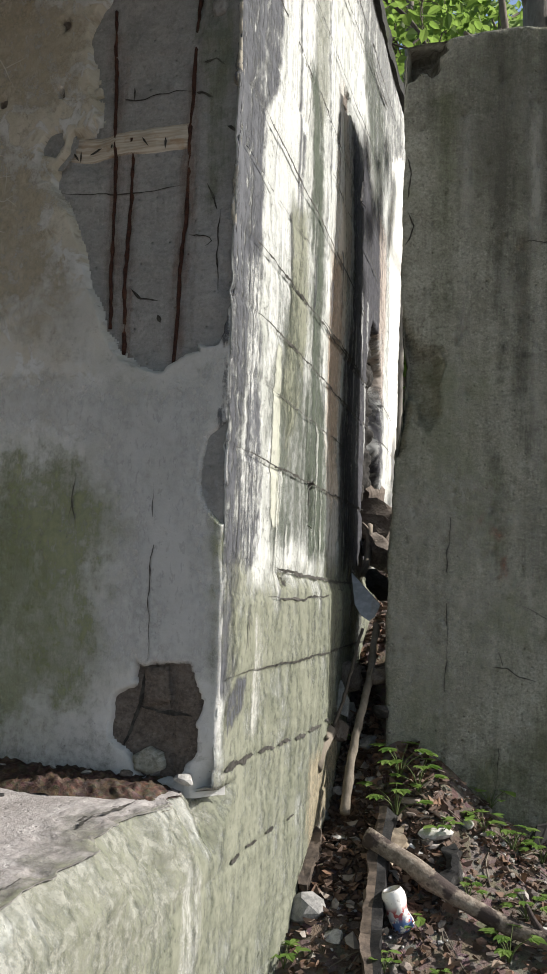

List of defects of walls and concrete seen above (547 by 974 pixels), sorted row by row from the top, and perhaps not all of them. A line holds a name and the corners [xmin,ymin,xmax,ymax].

spalling [44,0,246,372]
damp [516,125,541,336]
damp [213,0,405,735]
damp [0,381,209,709]
crack [442,603,450,692]
crack [444,517,452,572]
crack [495,654,536,682]
spalling [0,662,209,974]
damp [180,872,201,966]